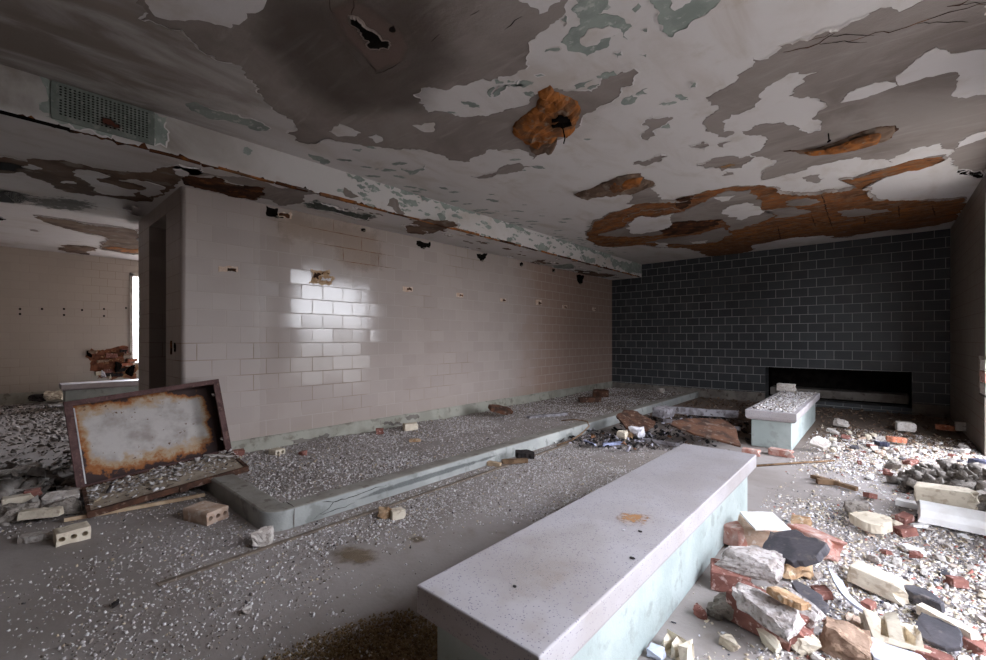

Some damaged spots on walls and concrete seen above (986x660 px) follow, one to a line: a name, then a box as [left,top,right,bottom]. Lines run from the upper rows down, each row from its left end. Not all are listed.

crack [787,0,986,52]
peeling [136,0,568,179]
peeling [553,68,641,129]
peeling [580,0,986,256]
peeling [0,156,492,261]
spalling [309,269,335,286]
peeling [502,248,636,284]
crack [320,485,386,514]